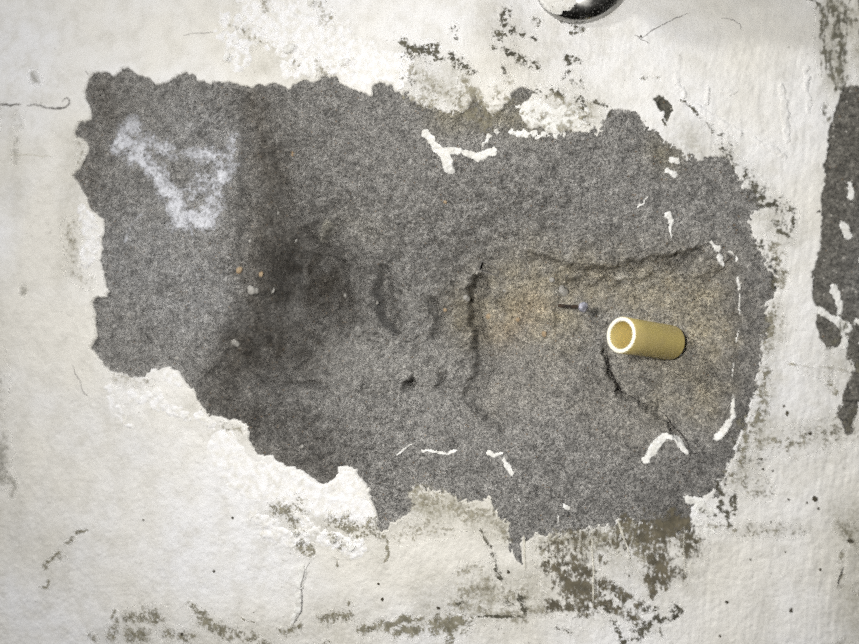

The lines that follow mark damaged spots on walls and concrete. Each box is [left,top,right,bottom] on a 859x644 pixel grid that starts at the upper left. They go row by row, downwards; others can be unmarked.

leakage [816,0,858,91]
spalling [72,35,778,565]
peeling [811,85,859,436]
crack [605,355,700,466]
leakage [699,367,858,536]
leakage [270,499,315,556]
leakage [318,503,702,644]